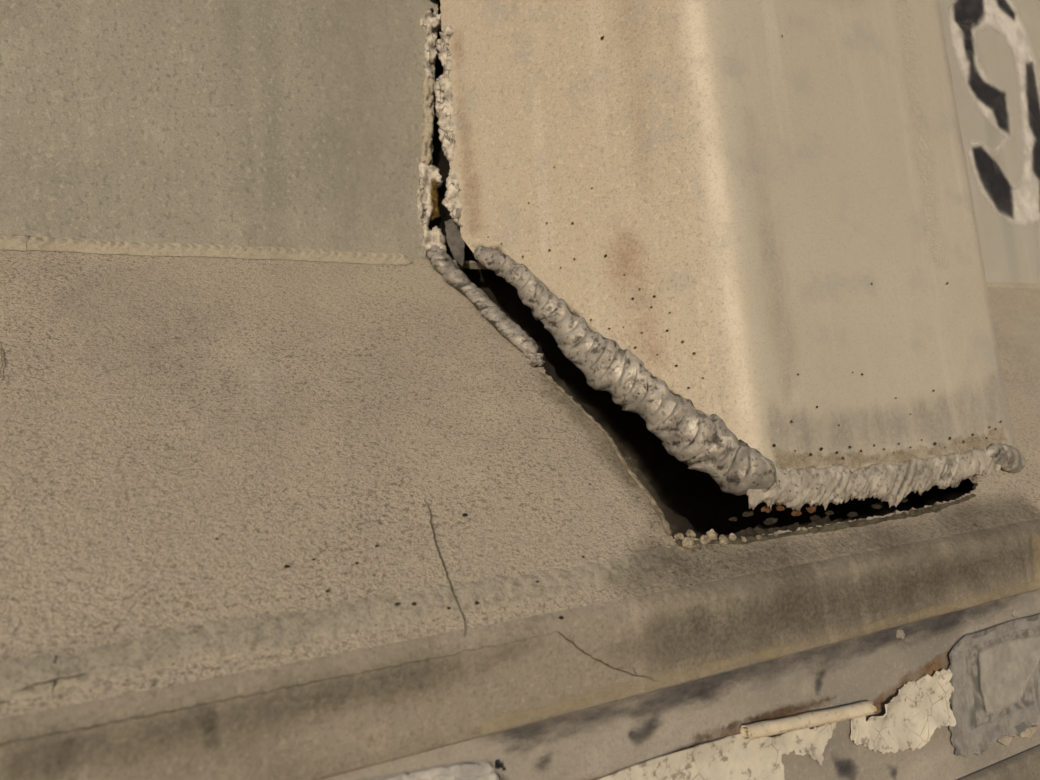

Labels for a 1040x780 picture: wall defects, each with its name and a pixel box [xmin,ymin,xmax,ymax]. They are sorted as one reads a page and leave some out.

crack [417,8,474,266]
crack [523,348,976,550]
crack [0,500,659,746]
peeling [597,669,956,780]